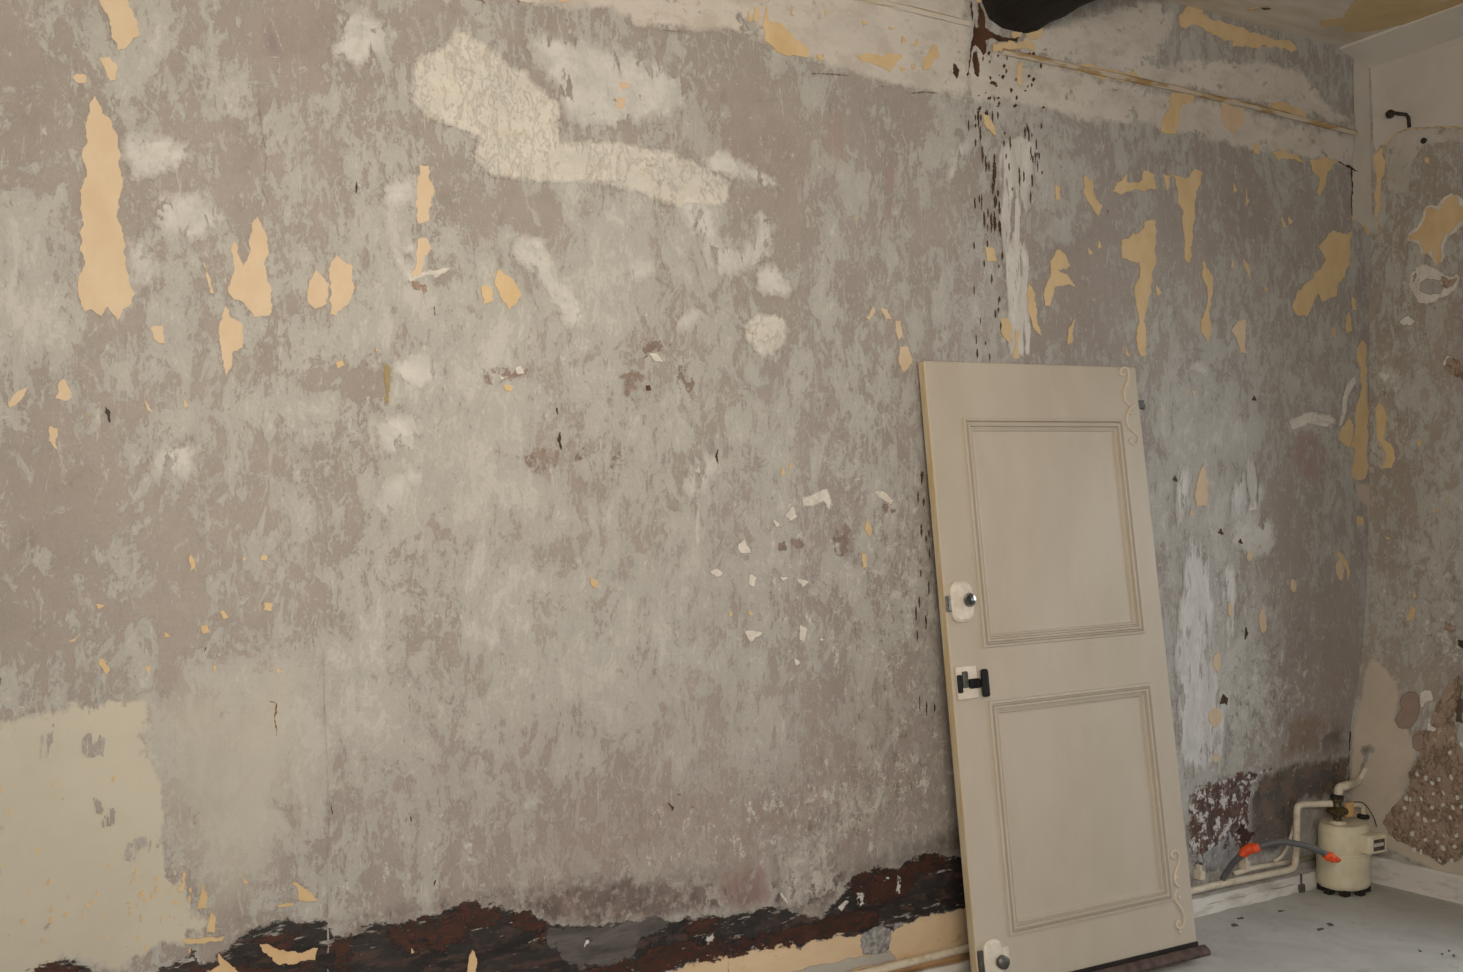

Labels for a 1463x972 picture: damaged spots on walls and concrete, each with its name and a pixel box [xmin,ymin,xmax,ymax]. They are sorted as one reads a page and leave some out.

peeling [99,0,139,81]
peeling [508,0,1355,196]
peeling [1320,0,1463,33]
peeling [72,74,135,320]
peeling [203,217,272,376]
peeling [307,255,355,316]
peeling [407,165,451,294]
peeling [1083,169,1213,357]
peeling [1289,126,1463,480]
leakage [1173,453,1276,869]
spalling [1382,675,1463,866]
leakage [325,808,961,940]